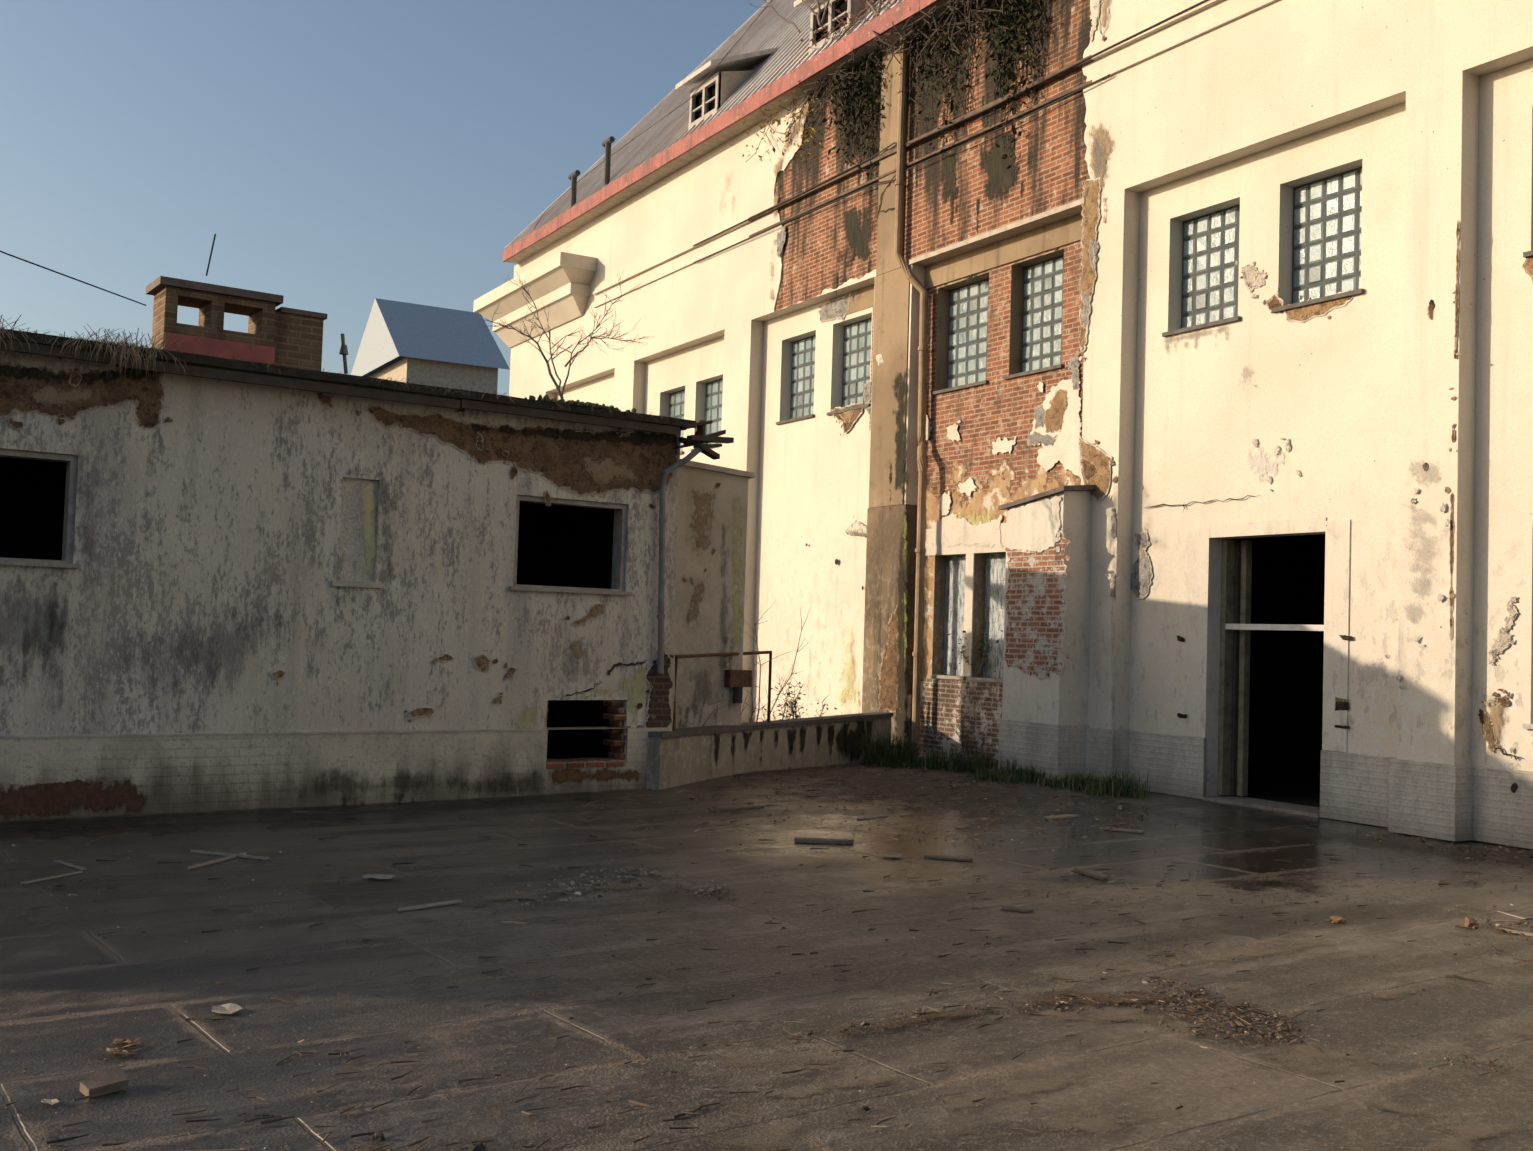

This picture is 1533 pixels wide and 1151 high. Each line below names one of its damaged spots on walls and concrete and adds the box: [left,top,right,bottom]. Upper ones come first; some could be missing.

flaking render [0,357,174,430]
flaking render [356,403,680,509]
flaking render [682,483,721,622]
flaking render [775,57,882,323]
damp [836,70,874,297]
damp [911,22,958,225]
flaking render [930,477,1071,680]
damp [976,0,1043,232]
flaking render [903,0,1153,600]
flaking render [1522,256,1533,285]